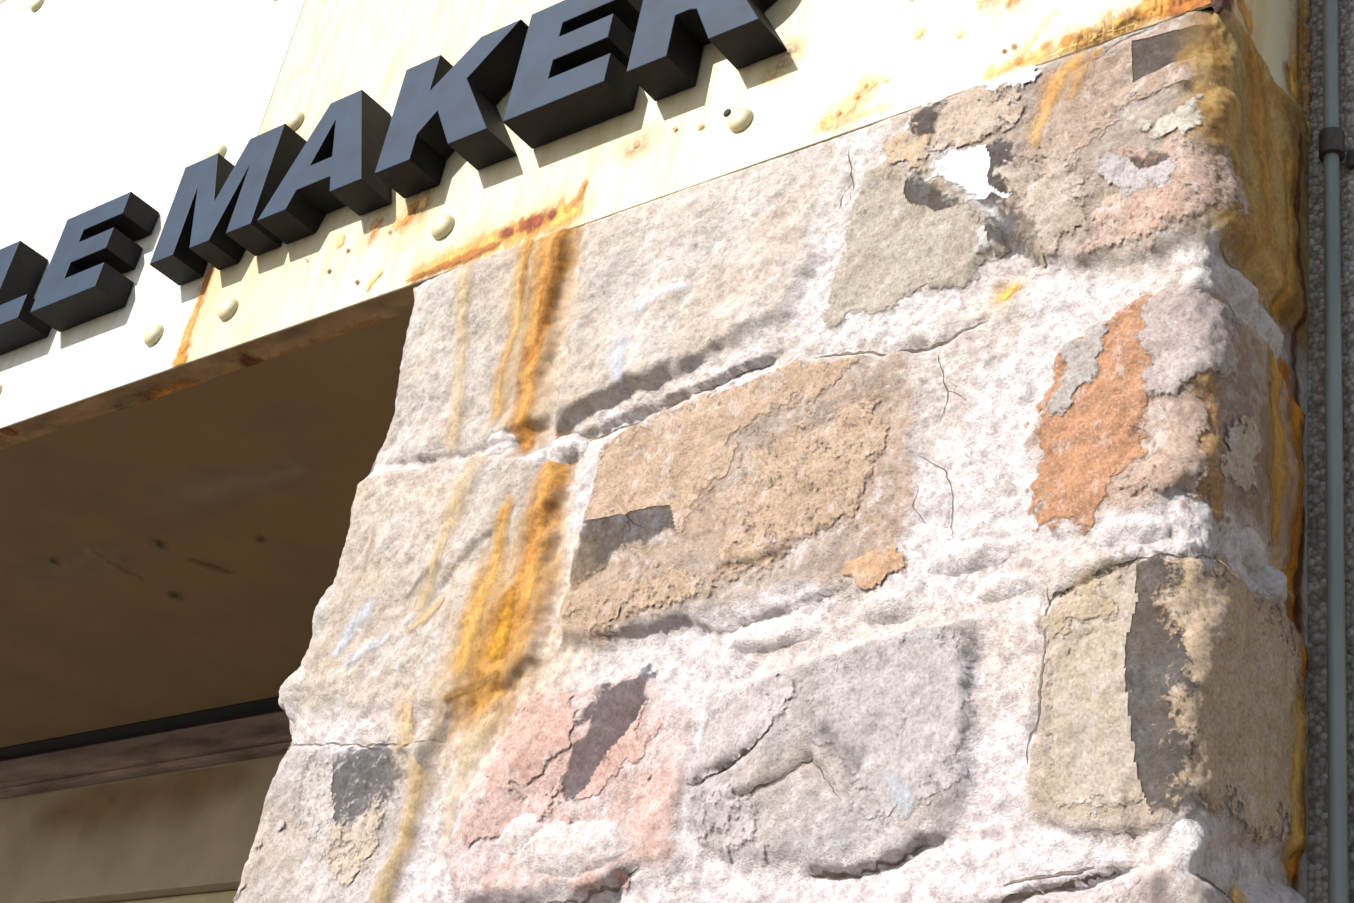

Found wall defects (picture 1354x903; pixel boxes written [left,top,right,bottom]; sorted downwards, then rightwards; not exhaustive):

rust [174,267,212,366]
rust [408,180,587,453]
peeling [823,10,1253,329]
rust [985,0,1309,891]
rust [443,460,571,755]
rust [376,759,425,903]